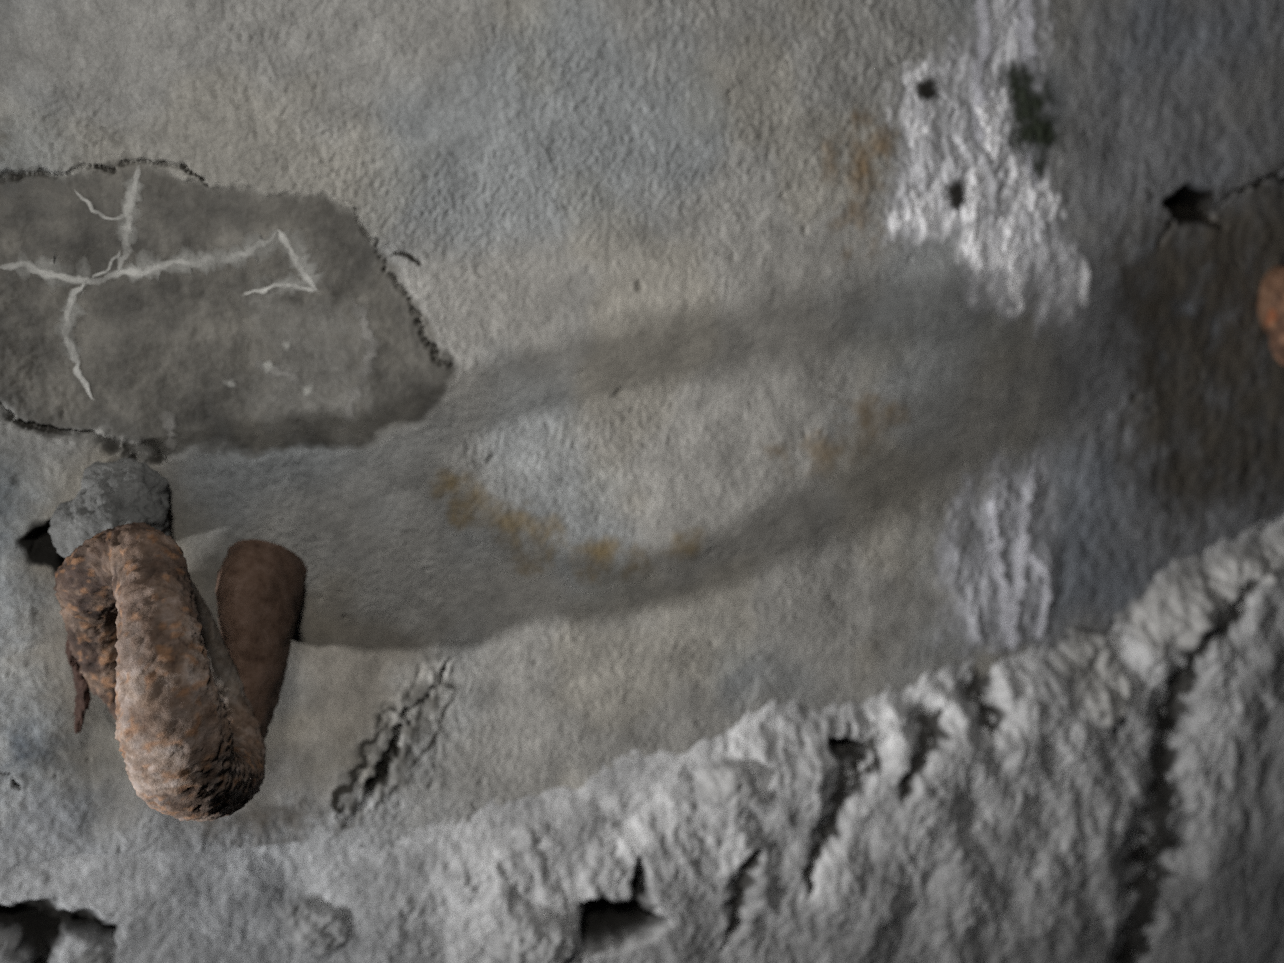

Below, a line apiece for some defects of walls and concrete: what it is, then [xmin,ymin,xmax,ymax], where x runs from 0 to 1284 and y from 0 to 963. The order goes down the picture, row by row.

spalling [0,161,455,454]
corrosion [65,635,91,734]
crack [331,655,457,828]